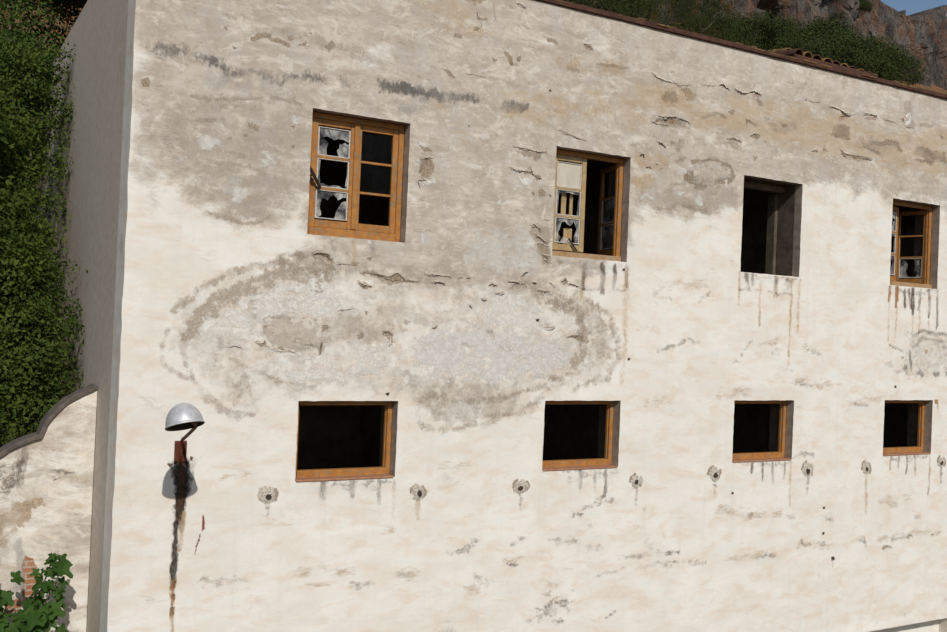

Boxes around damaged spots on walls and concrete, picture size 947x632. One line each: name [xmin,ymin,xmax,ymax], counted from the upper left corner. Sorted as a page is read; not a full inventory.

leakage [377,79,479,103]
spalling [652,115,690,128]
spalling [834,124,903,161]
spalling [312,250,419,289]
peeling [463,218,550,301]
leakage [888,286,920,315]
spalling [15,497,45,527]
rust [168,456,193,631]
flaking render [4,541,40,614]